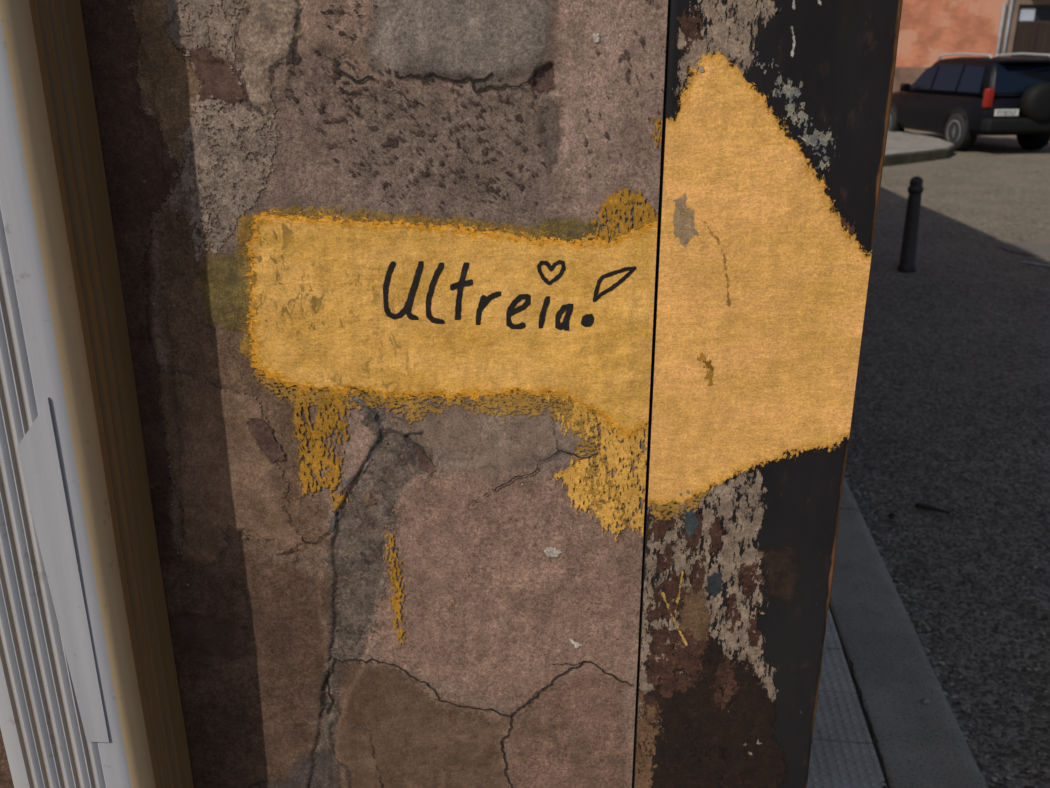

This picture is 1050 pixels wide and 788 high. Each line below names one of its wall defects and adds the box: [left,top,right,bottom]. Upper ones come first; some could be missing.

crack [336,71,544,106]
spalling [575,109,622,178]
peeling [610,0,836,171]
crack [469,418,598,505]
peeling [544,392,779,742]
crack [325,658,633,788]